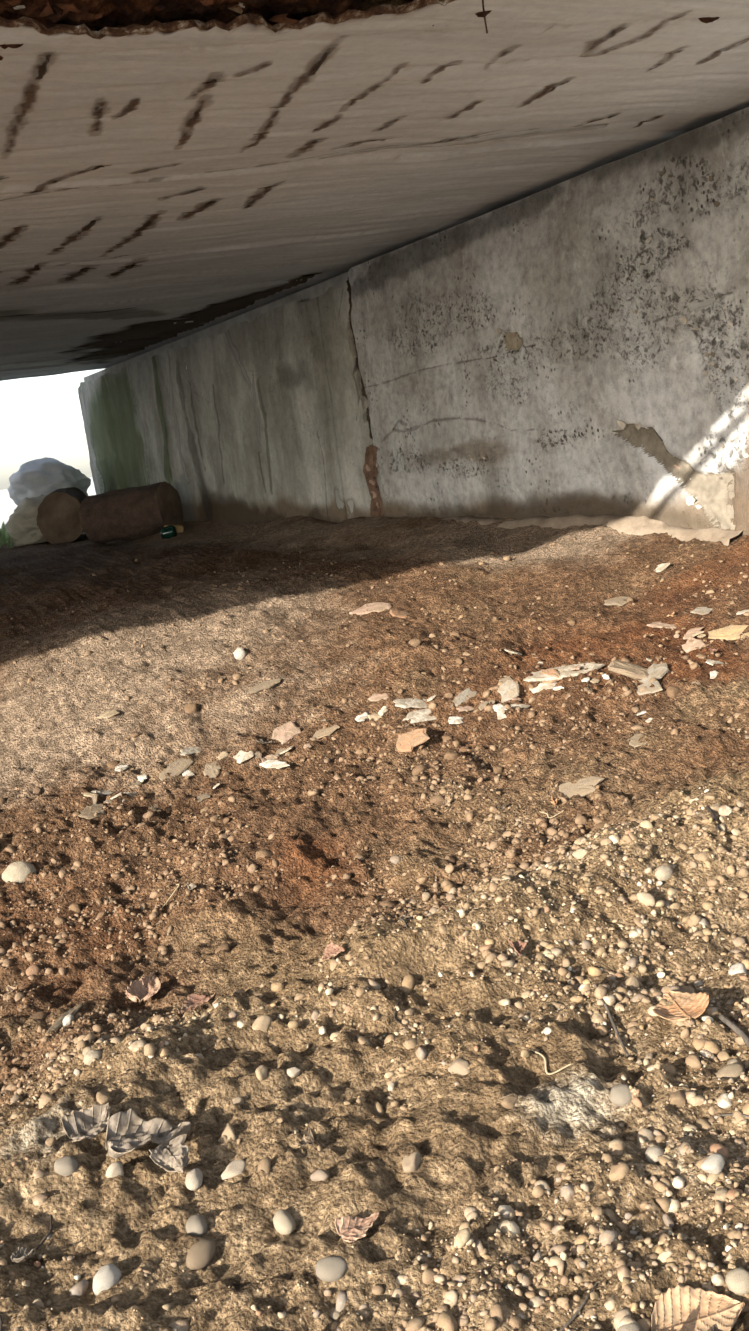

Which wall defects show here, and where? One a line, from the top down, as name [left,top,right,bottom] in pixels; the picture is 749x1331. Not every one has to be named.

spalling [0,0,414,31]
crack [346,279,379,488]
spalling [613,419,749,530]